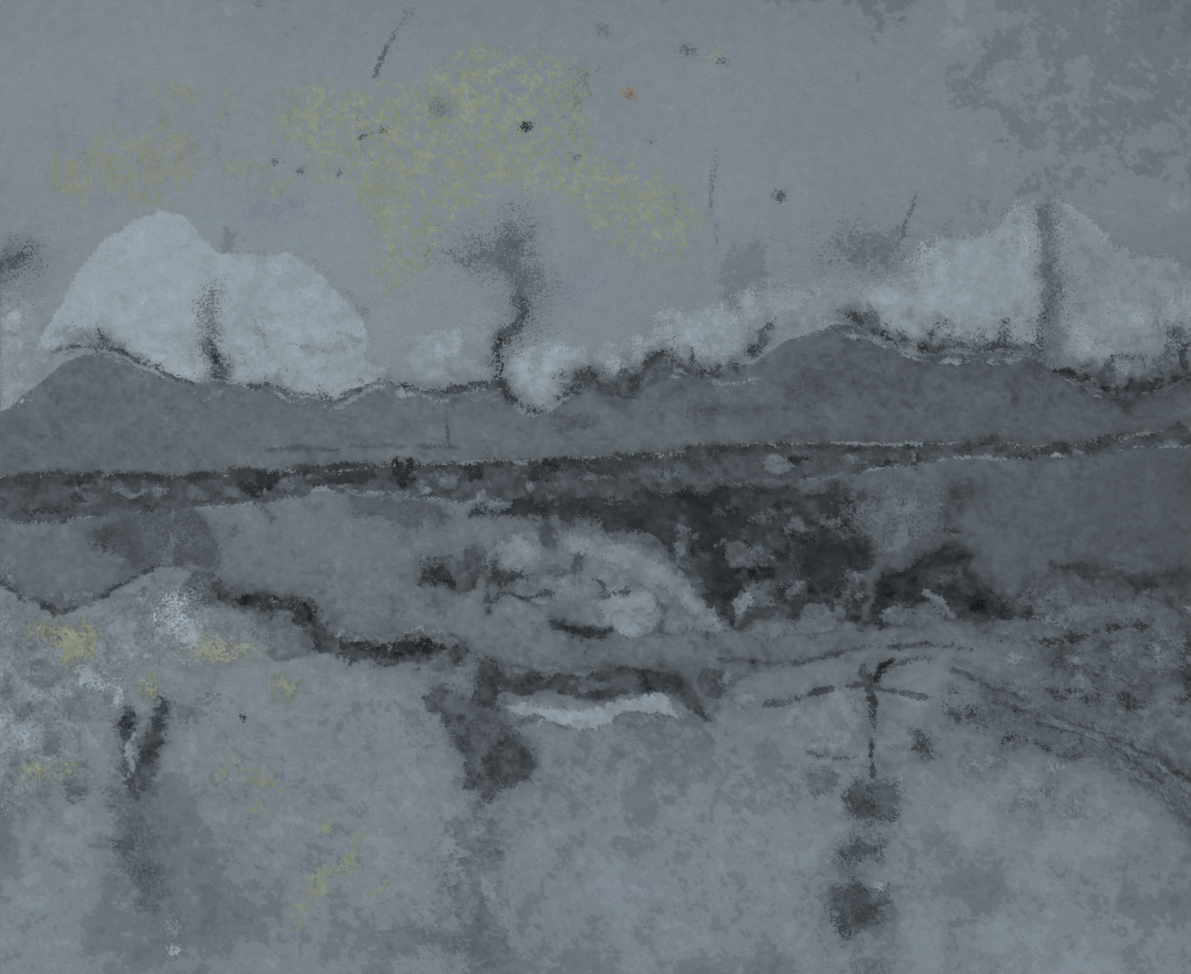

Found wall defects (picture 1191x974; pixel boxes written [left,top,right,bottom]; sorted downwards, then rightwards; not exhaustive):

water stain [0,6,1191,407]
crack [0,299,1191,527]
crack [0,565,158,618]
water stain [0,482,311,959]
spalling [183,567,470,679]
water stain [348,638,577,974]
peeling [500,692,683,734]
spalling [414,475,1191,694]
water stain [783,761,916,974]
water stain [907,683,1096,770]
water stain [988,583,1191,736]